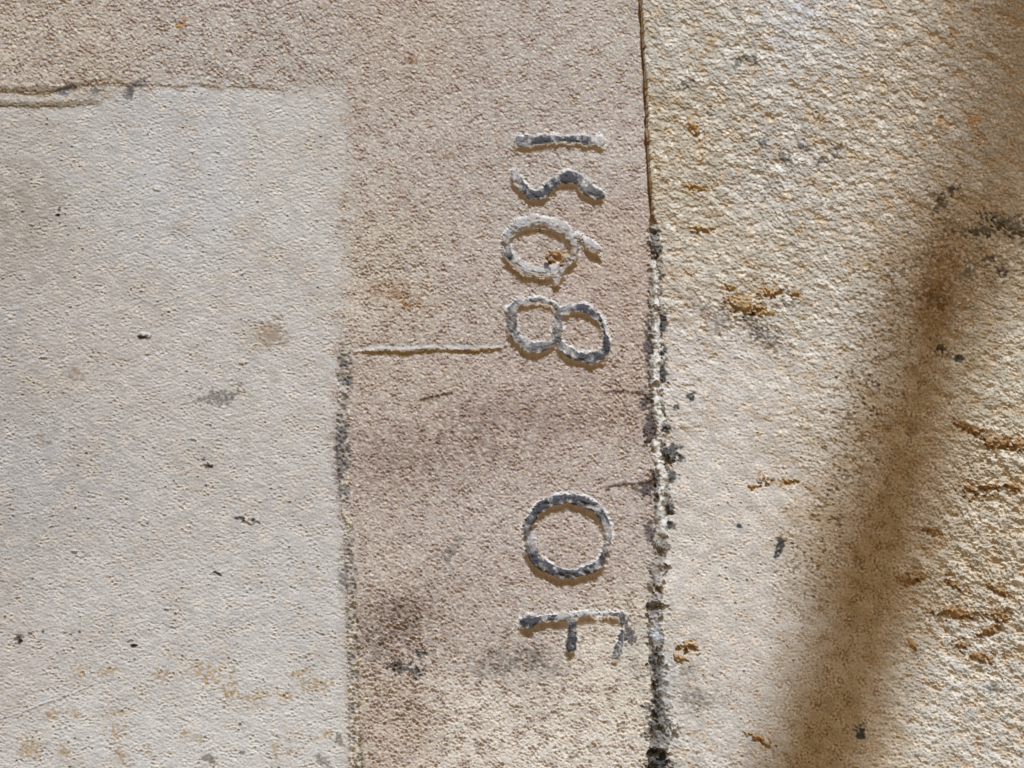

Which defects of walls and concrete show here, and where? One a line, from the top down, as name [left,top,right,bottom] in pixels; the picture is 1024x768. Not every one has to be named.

leakage [693,305,780,352]